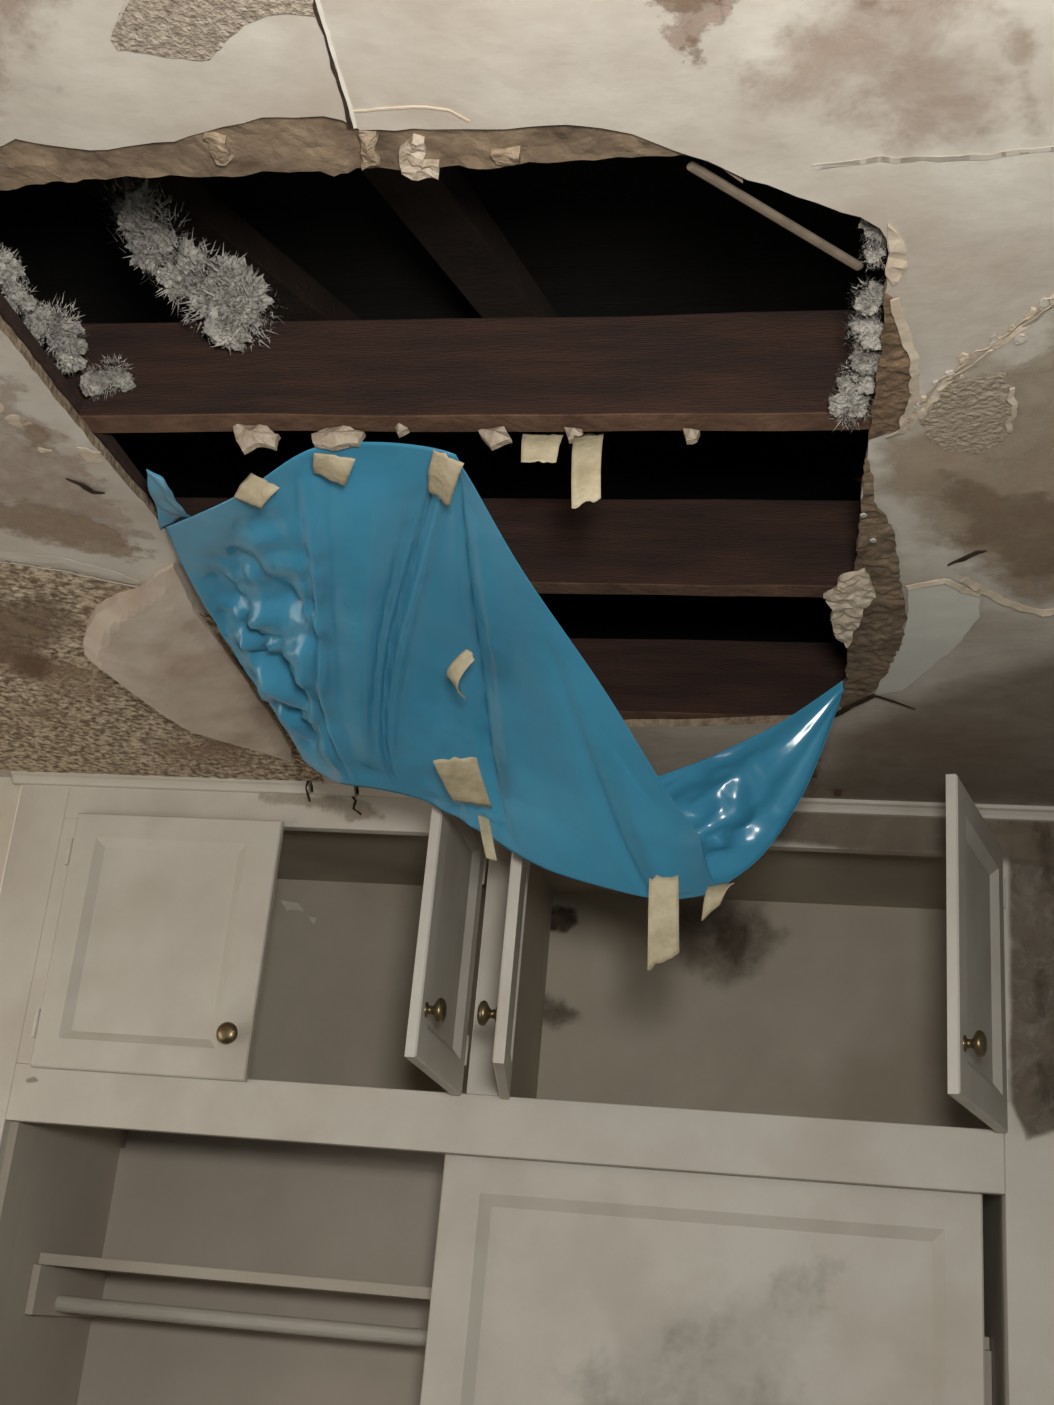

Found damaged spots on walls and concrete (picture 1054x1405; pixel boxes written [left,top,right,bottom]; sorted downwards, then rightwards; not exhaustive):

spalling [111,0,315,61]
damp [658,0,736,61]
peeling [399,133,440,181]
peeling [490,145,521,166]
crack [813,146,1054,170]
damp [887,354,1054,600]
crack [947,550,987,566]
peeling [823,568,876,648]
spalling [0,551,322,782]
crack [835,694,916,717]
damp [776,813,946,854]
damp [985,820,1054,1137]